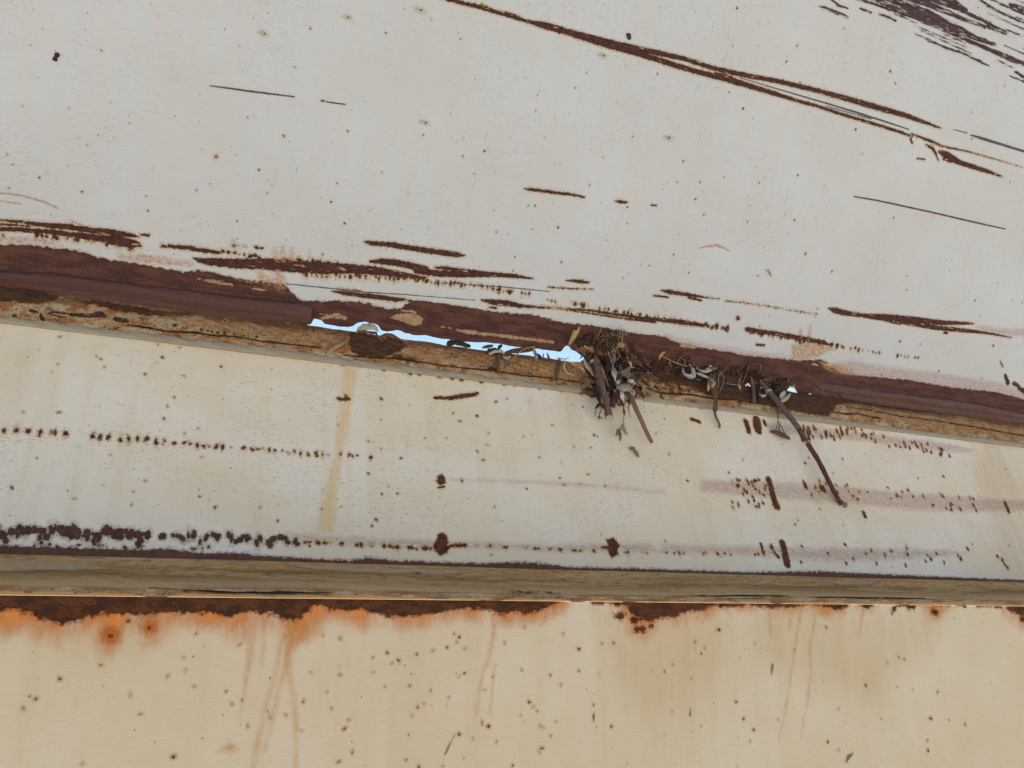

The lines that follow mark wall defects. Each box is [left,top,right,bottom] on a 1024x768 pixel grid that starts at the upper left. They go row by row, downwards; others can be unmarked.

peeling [938,150,1001,177]
spalling [161,244,264,259]
peeling [332,289,423,326]
peeling [400,277,568,311]
peeling [654,289,818,314]
corrosion [0,239,1024,438]
peeling [743,416,767,434]
corrosion [0,533,1024,582]
corrosion [0,589,566,646]
corrosion [591,602,873,634]
corrosion [891,605,943,616]
corrosion [963,606,1024,622]